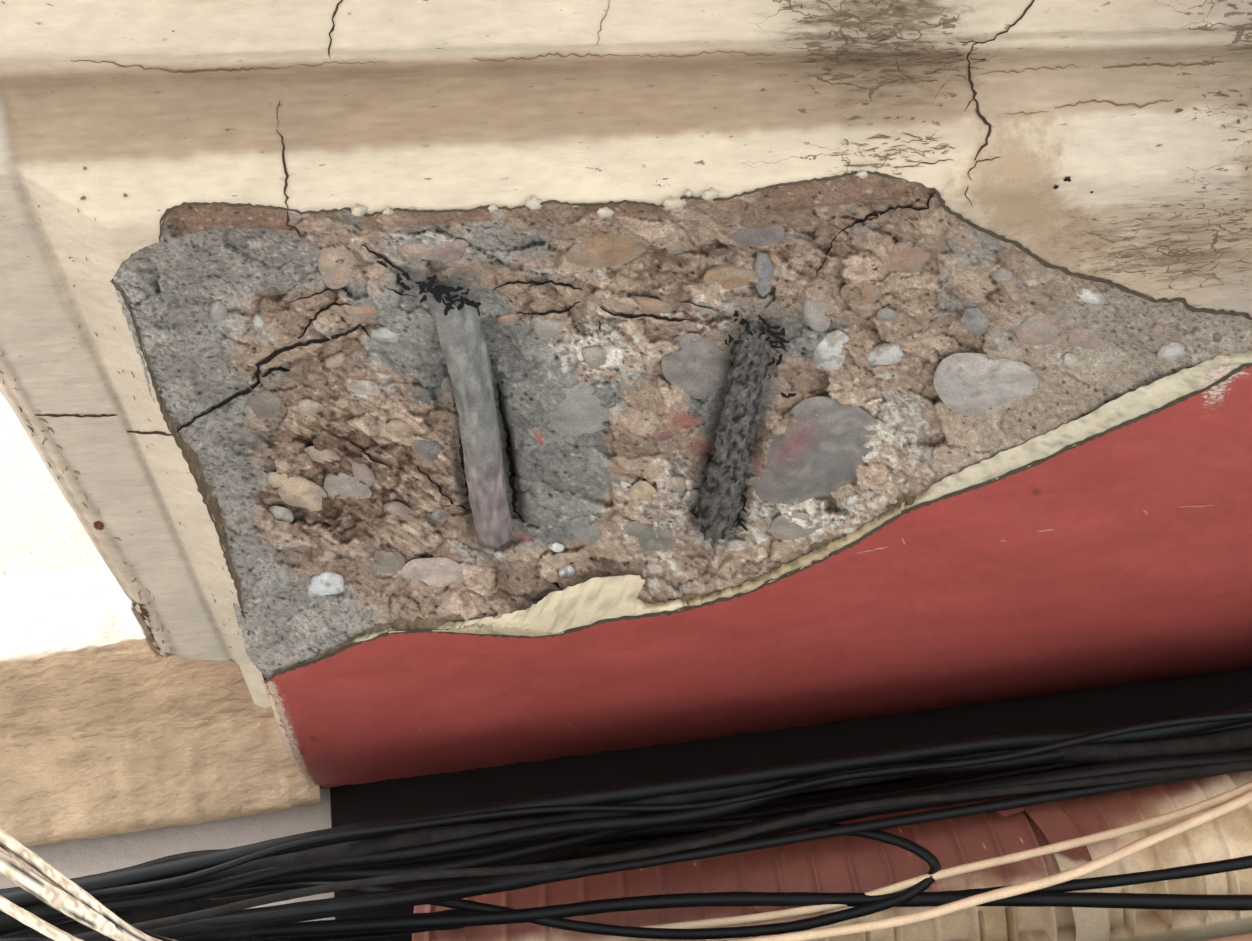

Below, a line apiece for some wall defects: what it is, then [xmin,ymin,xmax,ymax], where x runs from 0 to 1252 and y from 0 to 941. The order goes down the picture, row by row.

crack [70,0,389,74]
crack [472,0,771,62]
leakage [798,0,946,82]
crack [276,101,302,238]
crack [781,0,1252,283]
crack [361,244,416,298]
crack [35,287,371,436]
crack [334,434,470,511]
spalling [110,163,1252,788]